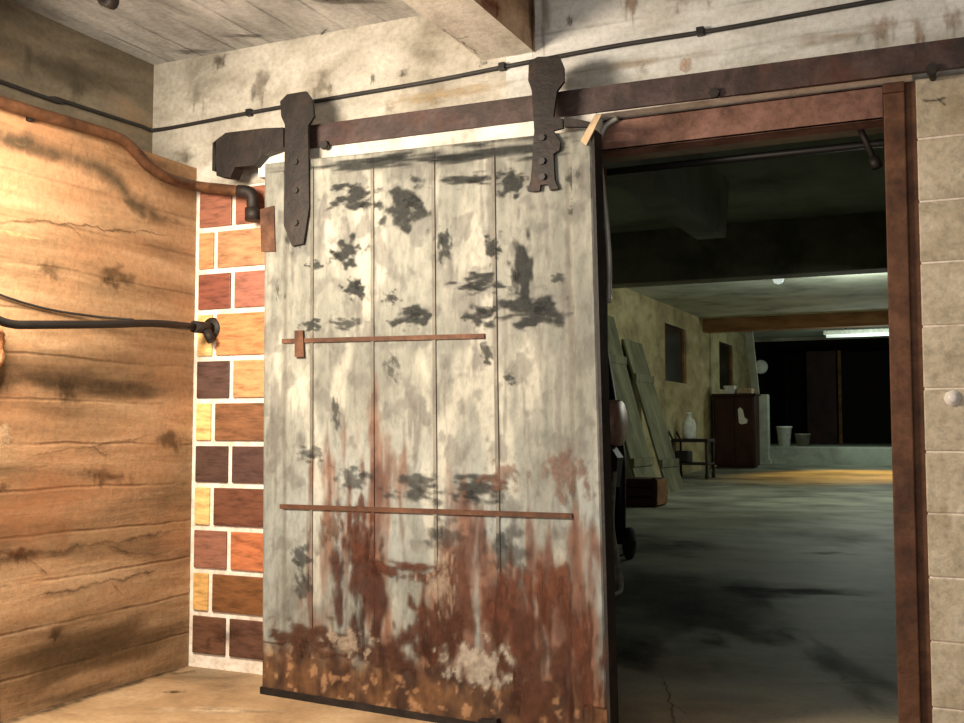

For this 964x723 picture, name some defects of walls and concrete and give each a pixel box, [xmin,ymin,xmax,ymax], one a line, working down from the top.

crack [0,533,158,594]